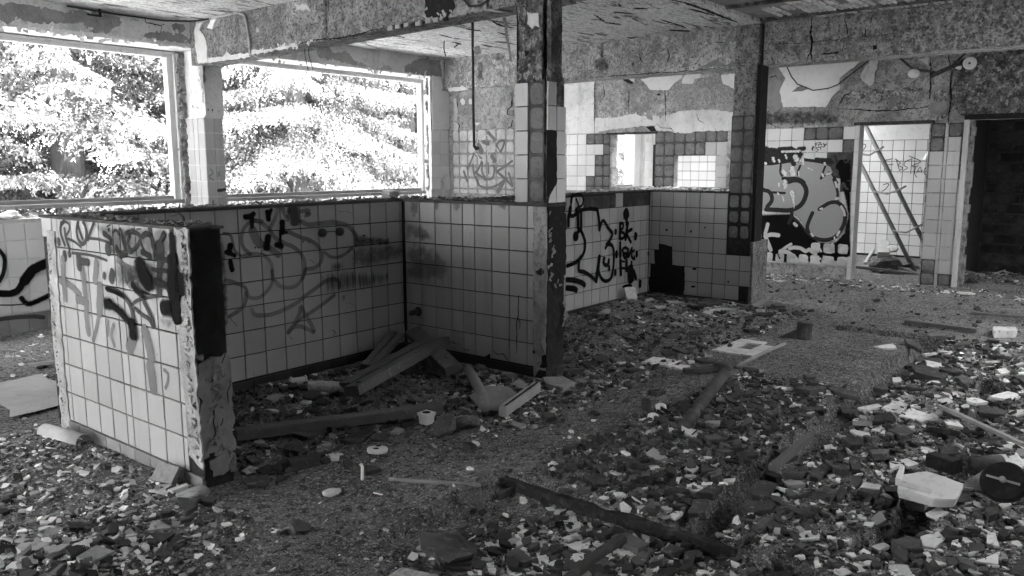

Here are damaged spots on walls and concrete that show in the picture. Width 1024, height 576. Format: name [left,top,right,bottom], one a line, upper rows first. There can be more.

flaking render [0,1,191,49]
crack [768,17,896,75]
crack [837,90,930,112]
peeling [583,51,854,239]
peeling [518,1,562,377]
peeling [649,244,696,291]
peeling [174,227,238,481]